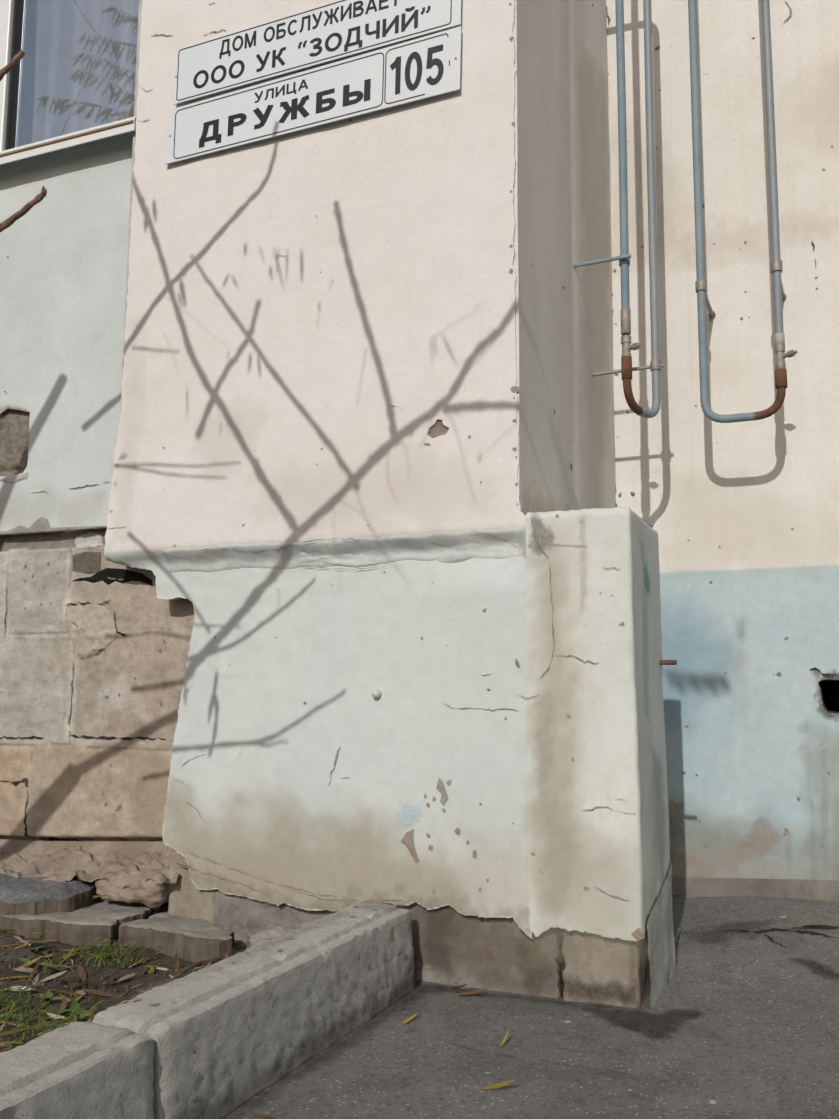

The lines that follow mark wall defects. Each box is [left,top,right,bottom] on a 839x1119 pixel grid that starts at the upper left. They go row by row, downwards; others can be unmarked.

spalling [424,420,450,446]
crack [65,600,126,659]
crack [2,733,42,741]
crack [69,684,165,740]
crack [0,778,81,841]